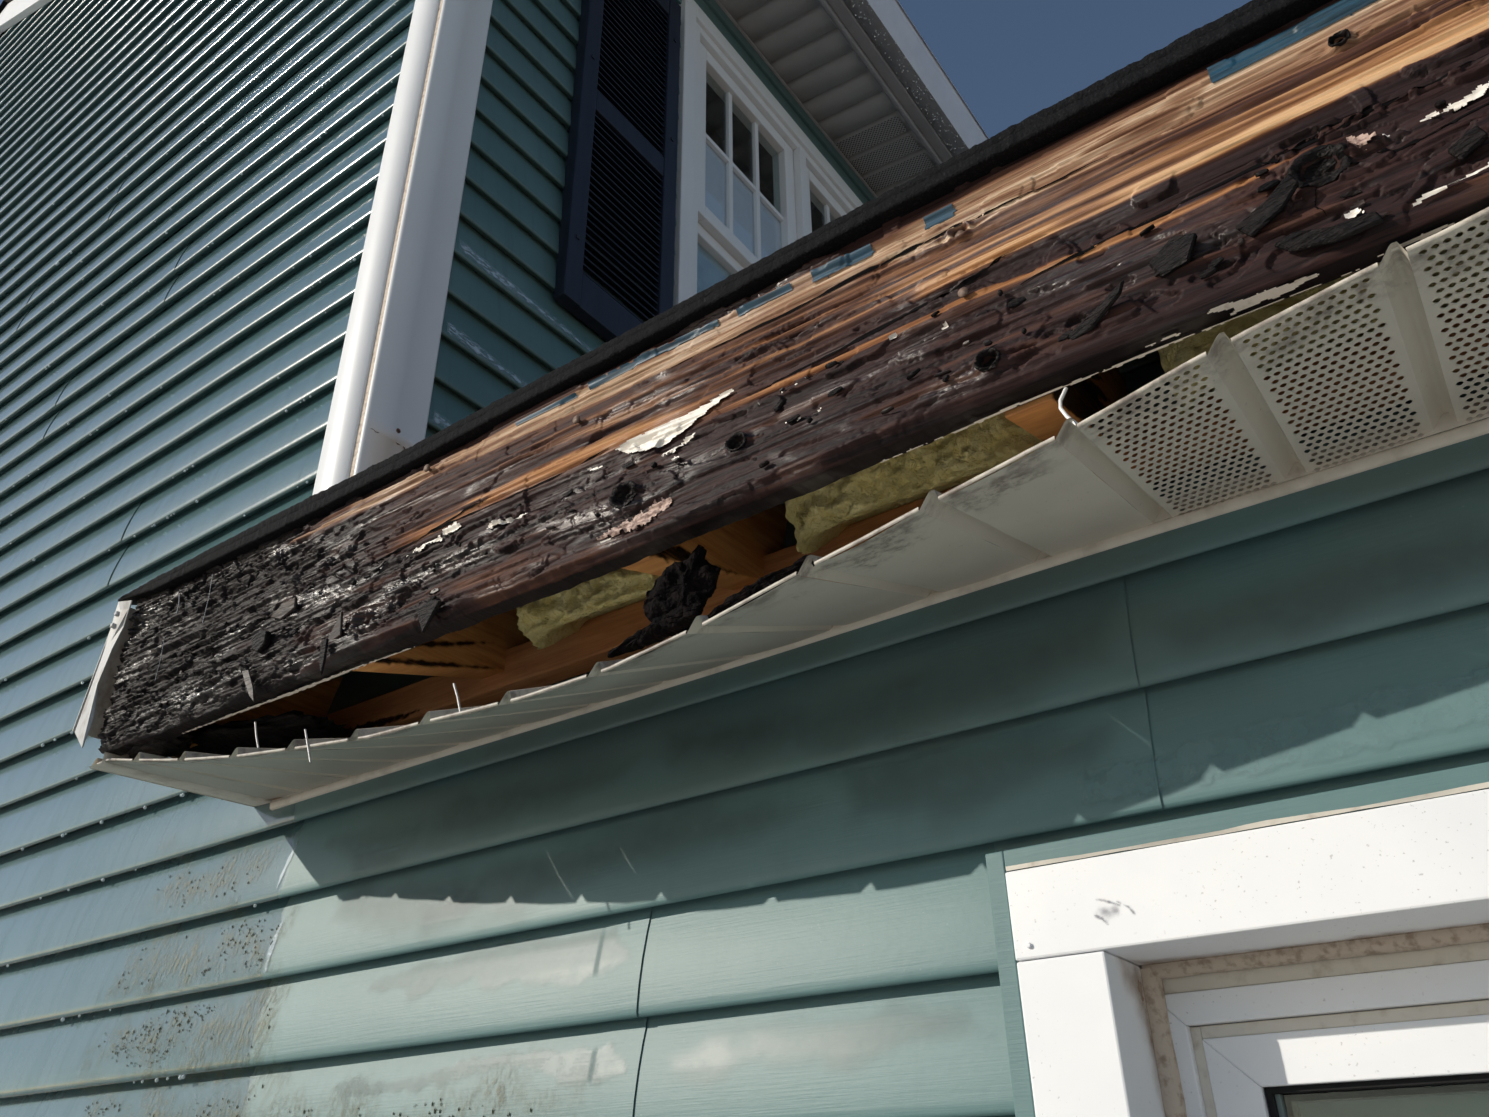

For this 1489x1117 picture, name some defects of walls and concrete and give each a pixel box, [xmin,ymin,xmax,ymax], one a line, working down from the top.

peeling [1420,81,1489,122]
peeling [1346,132,1390,150]
peeling [1255,168,1281,193]
peeling [1340,190,1365,219]
peeling [1413,162,1489,207]
peeling [881,273,1322,463]
peeling [758,383,843,424]
peeling [615,389,734,469]
peeling [487,503,527,529]
peeling [595,497,672,543]
peeling [406,522,461,600]
peeling [183,648,411,734]